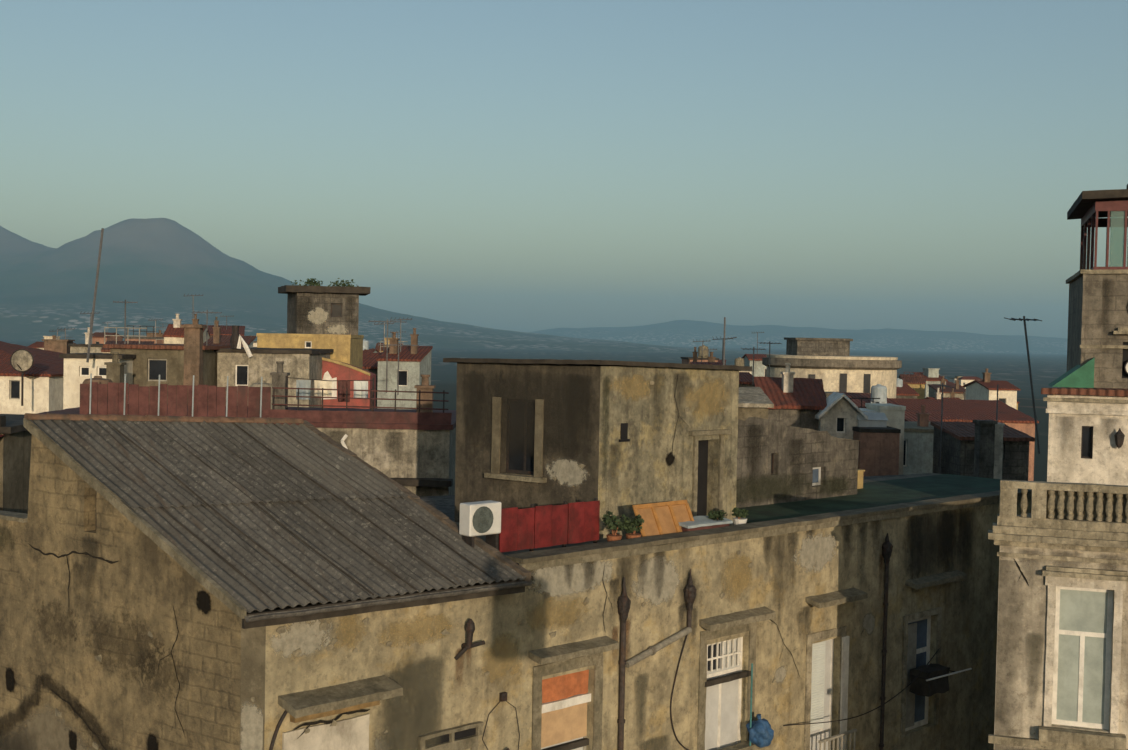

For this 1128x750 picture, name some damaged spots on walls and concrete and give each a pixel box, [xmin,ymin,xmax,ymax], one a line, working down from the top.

peeling [546,459,588,486]
crack [29,544,119,602]
crack [157,607,185,735]